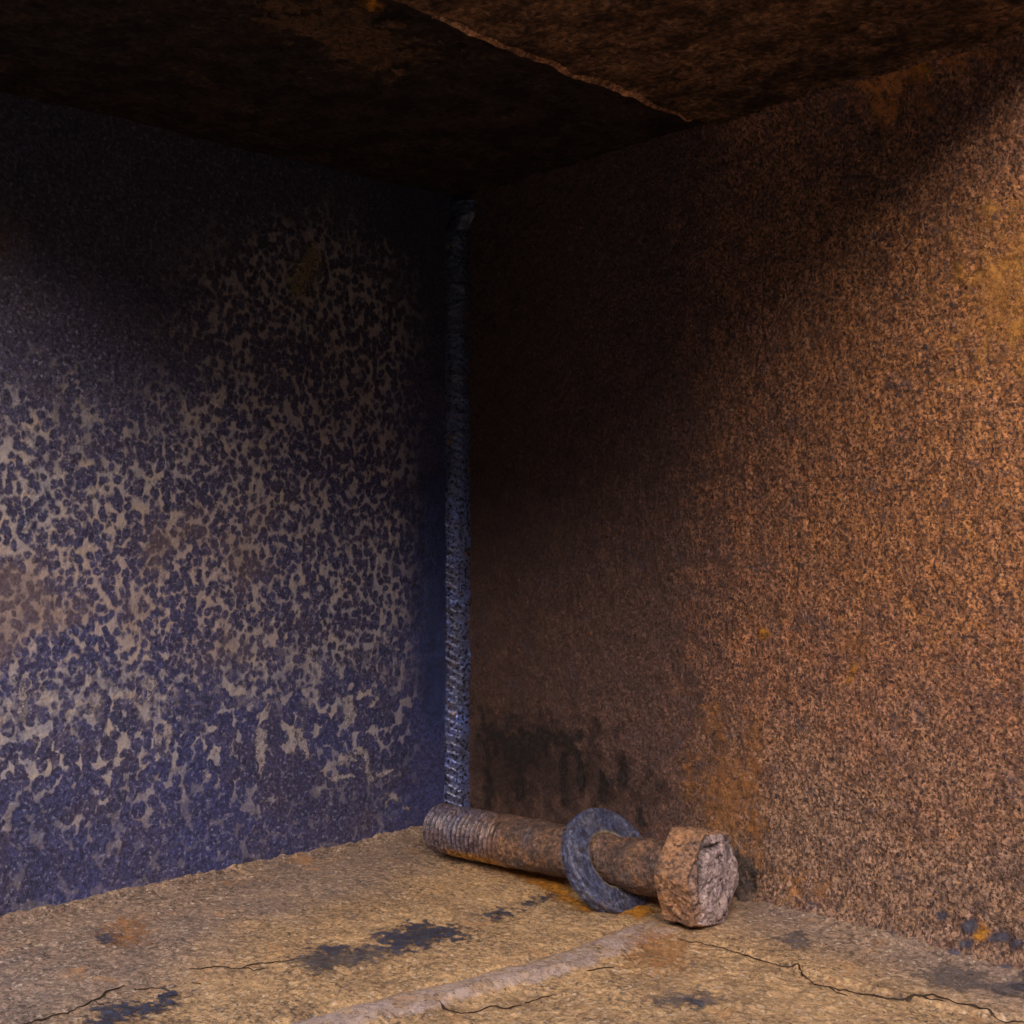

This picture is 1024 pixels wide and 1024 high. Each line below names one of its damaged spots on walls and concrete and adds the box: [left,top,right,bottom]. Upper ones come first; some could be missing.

damp [477,708,585,807]
damp [286,892,556,975]
rust [492,864,592,912]
rust [622,905,654,919]
crack [24,985,166,1024]
damp [82,985,198,1024]
crack [189,956,310,984]
crack [677,938,1024,1023]